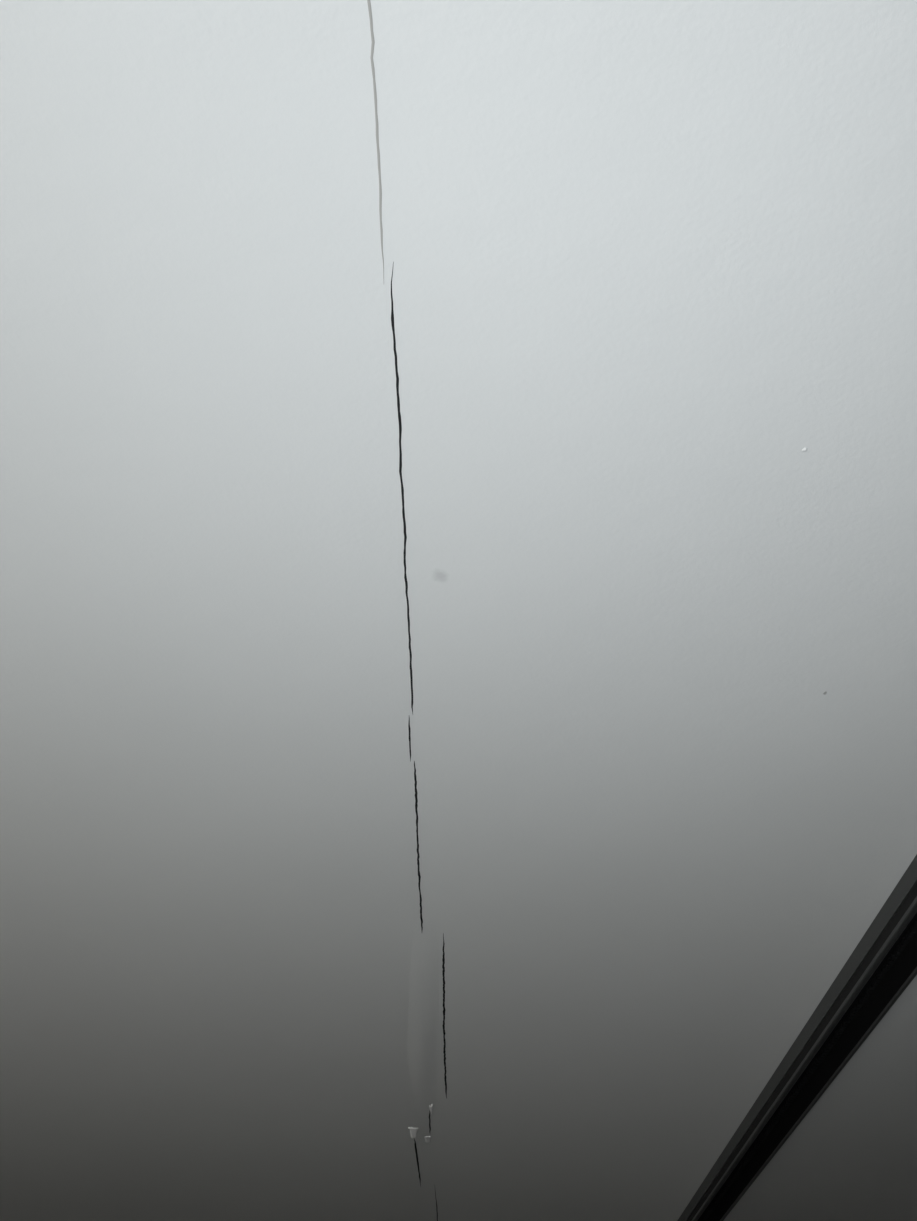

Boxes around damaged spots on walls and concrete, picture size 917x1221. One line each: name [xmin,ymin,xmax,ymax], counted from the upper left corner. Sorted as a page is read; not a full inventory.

crack [367,0,447,1221]